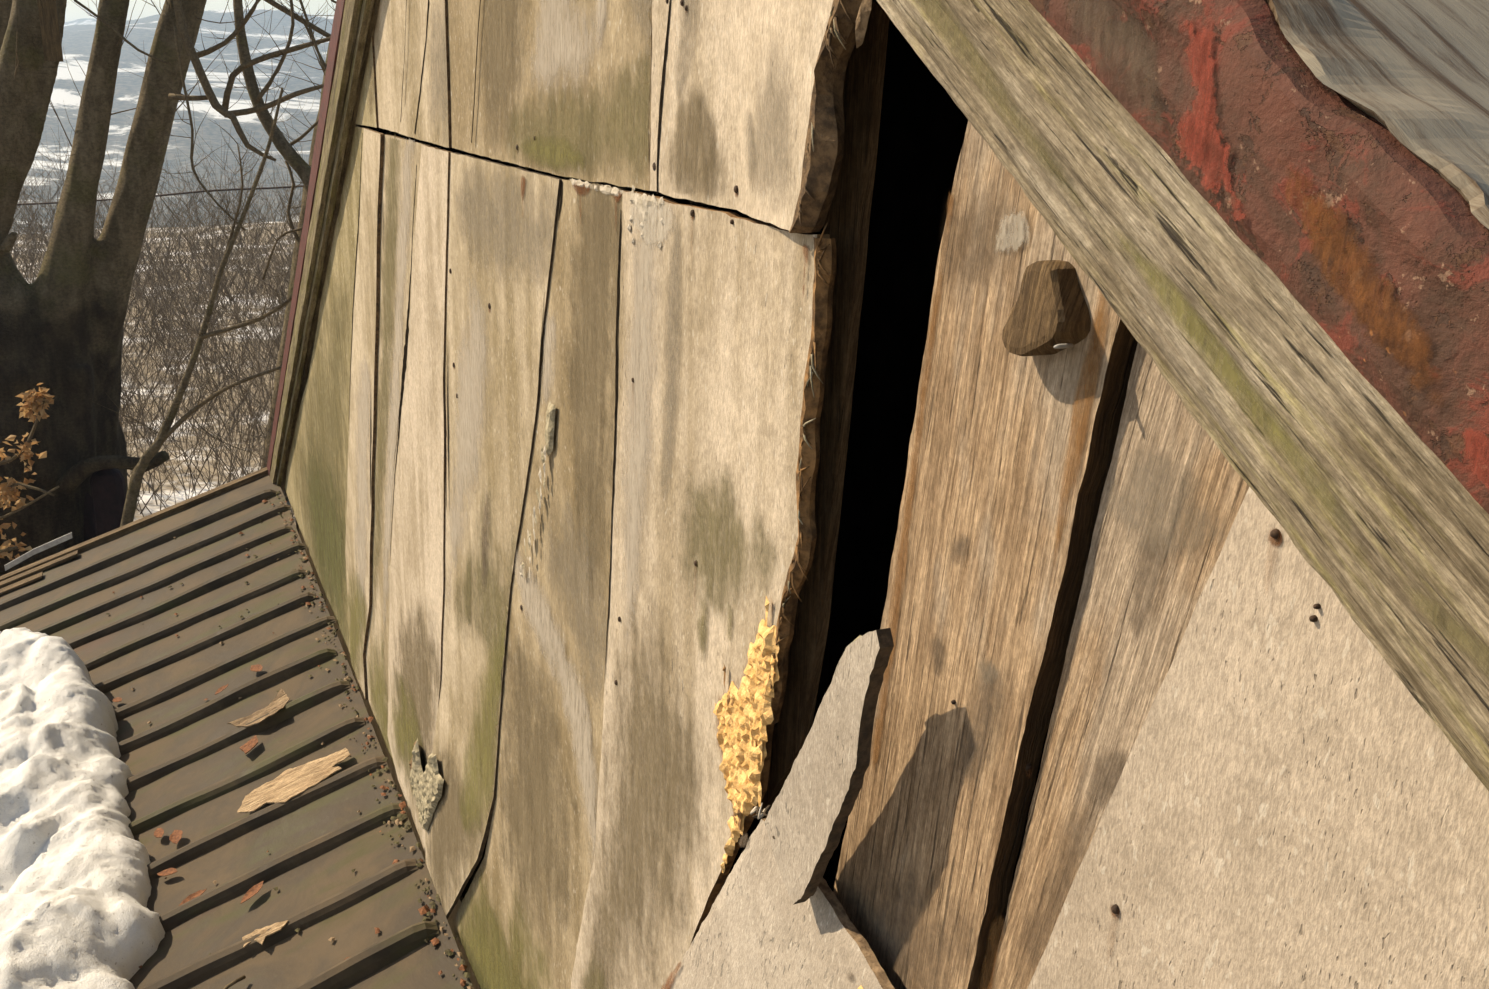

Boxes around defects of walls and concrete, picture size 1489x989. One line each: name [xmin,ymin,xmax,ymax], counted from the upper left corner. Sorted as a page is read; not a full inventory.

leakage [669,96,721,192]
leakage [485,0,650,673]
leakage [394,611,439,772]
leakage [458,508,567,925]
leakage [590,627,699,989]
leakage [687,481,769,651]
peeling [713,596,779,873]